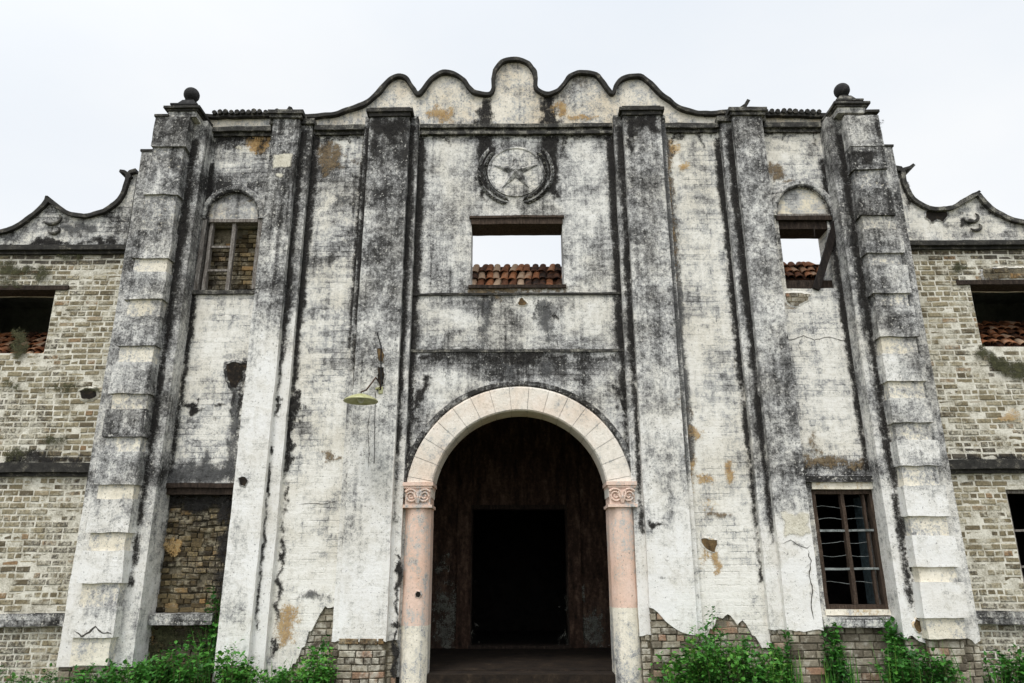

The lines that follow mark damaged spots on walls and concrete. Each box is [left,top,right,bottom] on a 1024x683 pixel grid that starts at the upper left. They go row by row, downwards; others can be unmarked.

hole [223,360,247,391]
leakage [255,97,774,659]
spalling [699,536,719,554]
crack [785,540,817,619]
crack [75,625,111,637]
flaking render [287,606,398,683]
flaking render [640,608,827,683]
flaking render [902,618,984,683]